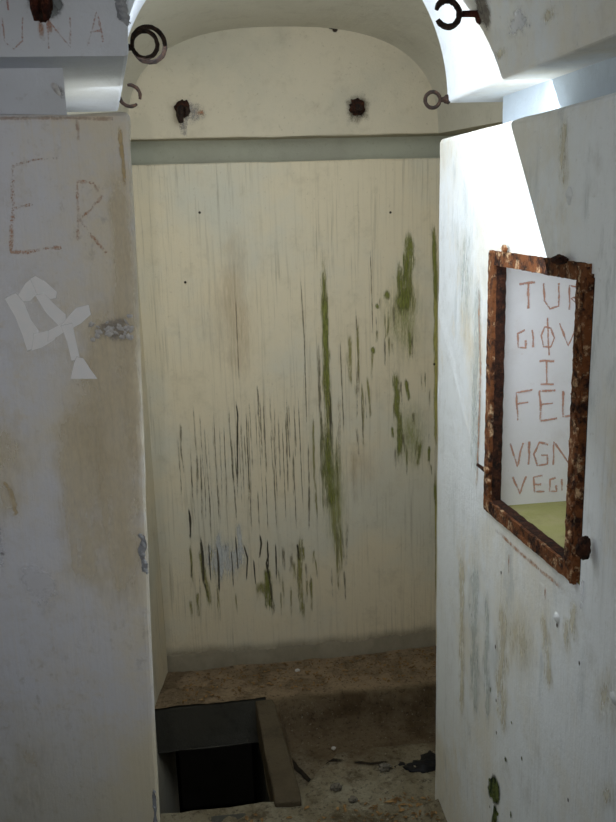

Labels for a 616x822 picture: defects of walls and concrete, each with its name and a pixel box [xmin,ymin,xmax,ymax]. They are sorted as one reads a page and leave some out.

corrosion [39,0,63,35]
corrosion [476,0,490,28]
damp [340,338,371,425]
damp [191,297,342,560]
damp [190,526,277,608]
damp [297,542,312,614]